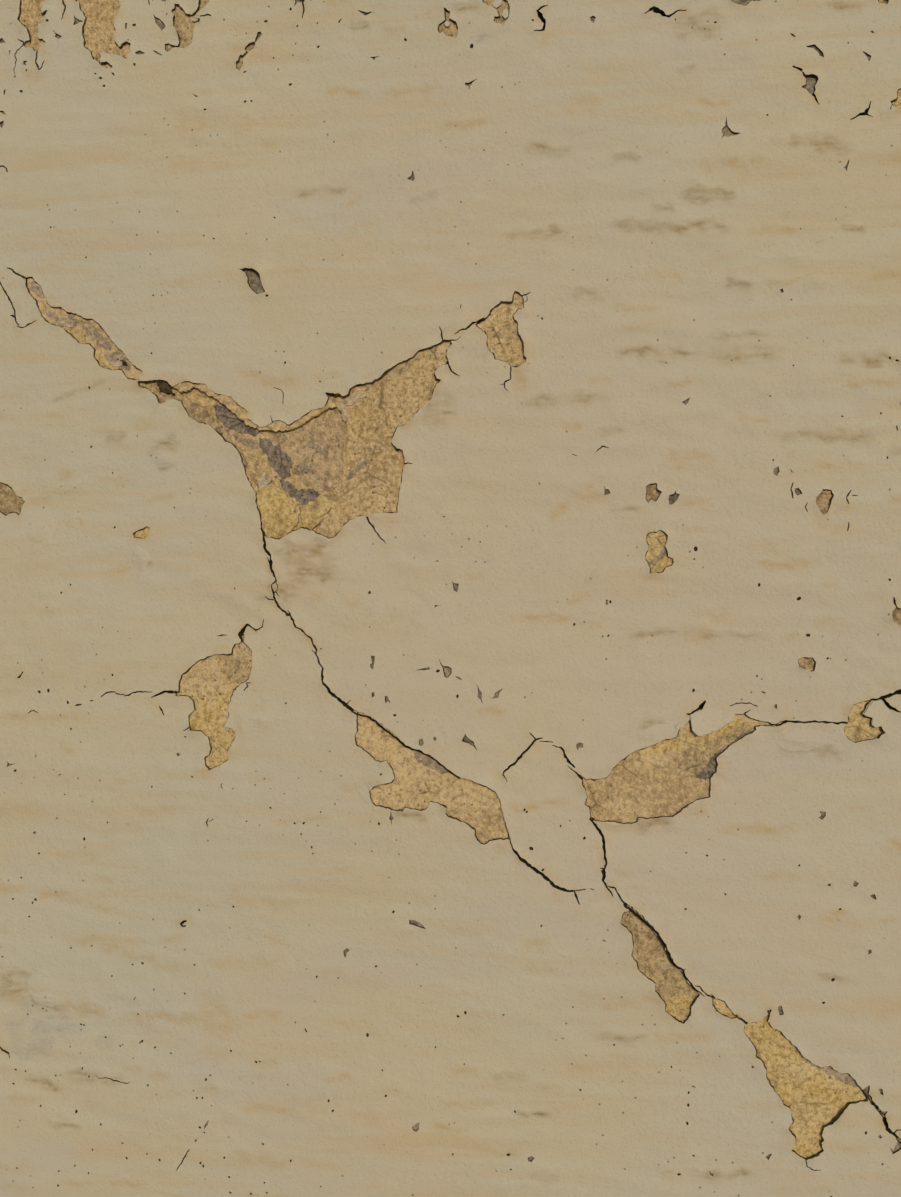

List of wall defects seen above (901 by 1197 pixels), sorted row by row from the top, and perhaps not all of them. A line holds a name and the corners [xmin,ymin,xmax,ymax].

peeling [73,0,210,79]
peeling [24,277,452,539]
peeling [173,636,252,770]
crack [218,528,461,779]
peeling [354,710,510,845]
crack [502,733,582,781]
peeling [579,709,782,824]
crack [687,700,848,726]
crack [870,689,901,712]
crack [509,817,748,1024]
peeling [621,905,888,1160]
crack [865,1095,901,1144]